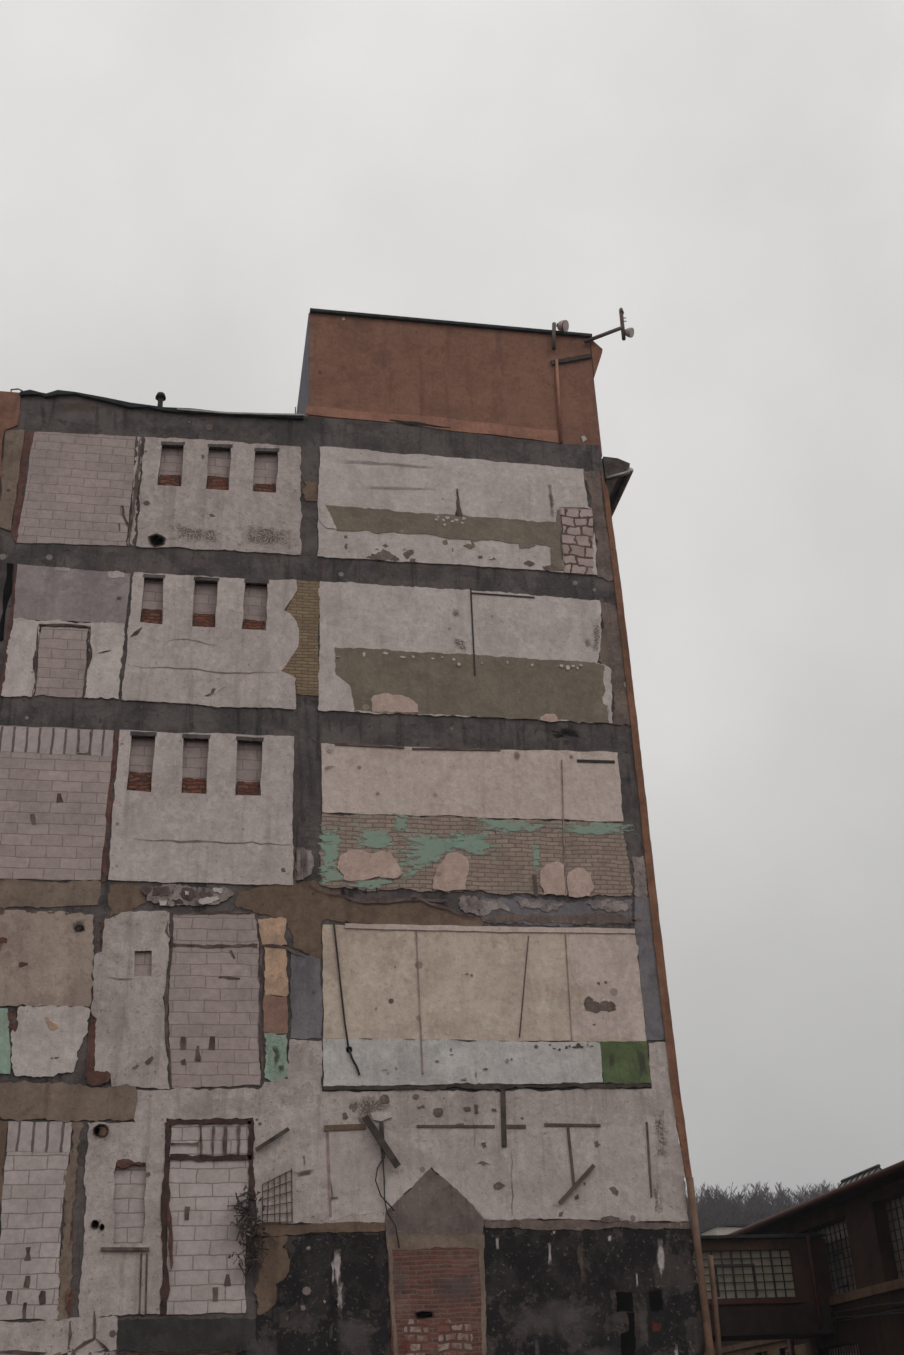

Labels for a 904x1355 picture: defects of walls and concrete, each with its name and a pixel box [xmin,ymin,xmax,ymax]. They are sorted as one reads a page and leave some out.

crack [122,437,141,546]
peeling [371,693,419,713]
peeling [540,714,558,722]
peeling [602,671,613,724]
peeling [281,814,632,889]
peeling [459,895,643,925]
damp [331,1254,342,1304]
spalling [414,1310,434,1319]